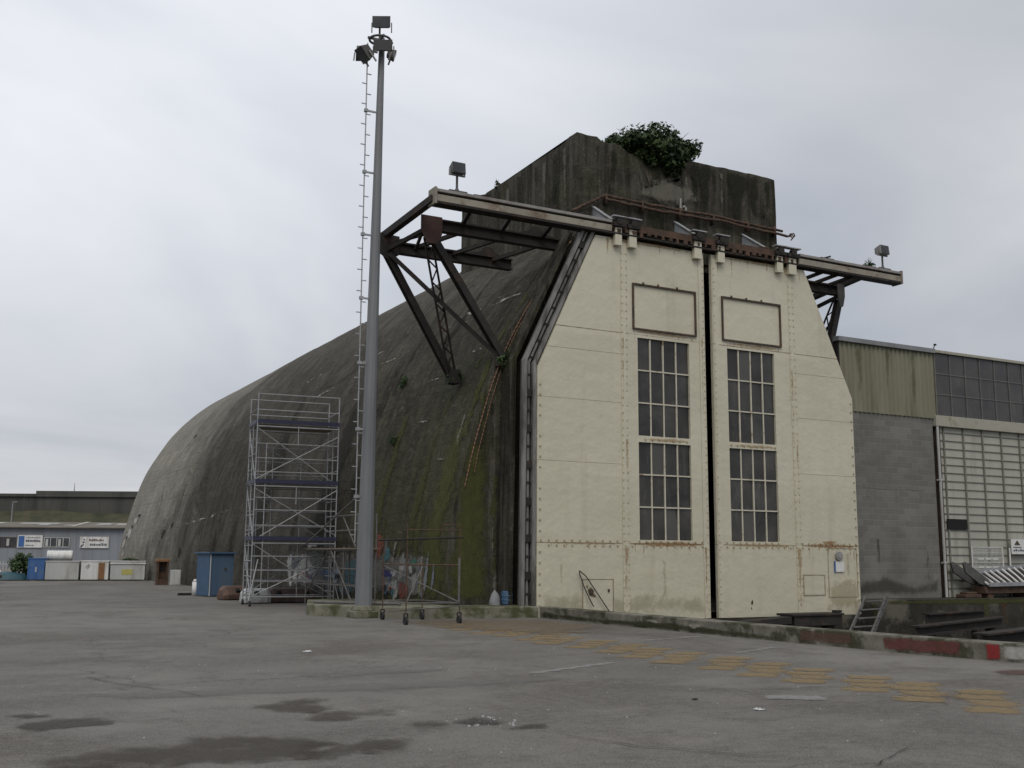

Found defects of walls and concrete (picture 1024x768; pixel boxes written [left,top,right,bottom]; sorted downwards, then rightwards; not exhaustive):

corrosion [611,221,799,263]
corrosion [634,542,707,582]